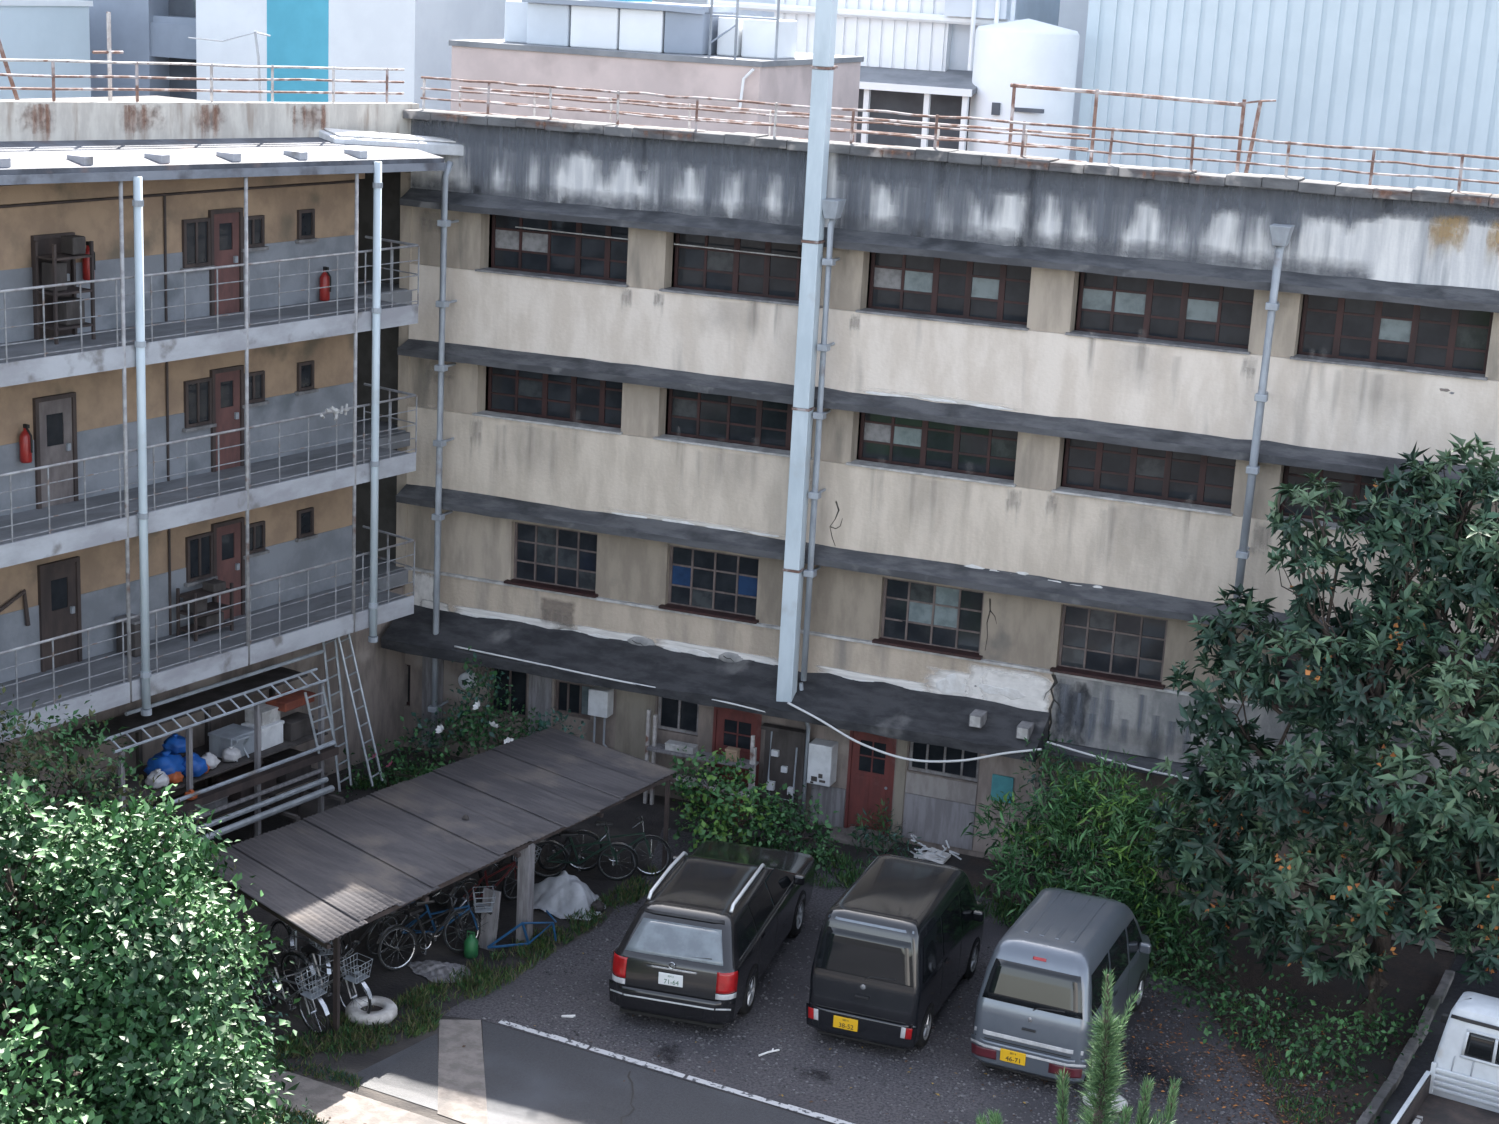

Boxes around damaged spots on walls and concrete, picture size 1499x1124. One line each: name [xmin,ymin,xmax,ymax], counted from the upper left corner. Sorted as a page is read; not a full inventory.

water stain [411,119,807,226]
water stain [827,154,1499,279]
flaking render [818,665,1051,712]
crack [1044,674,1067,744]